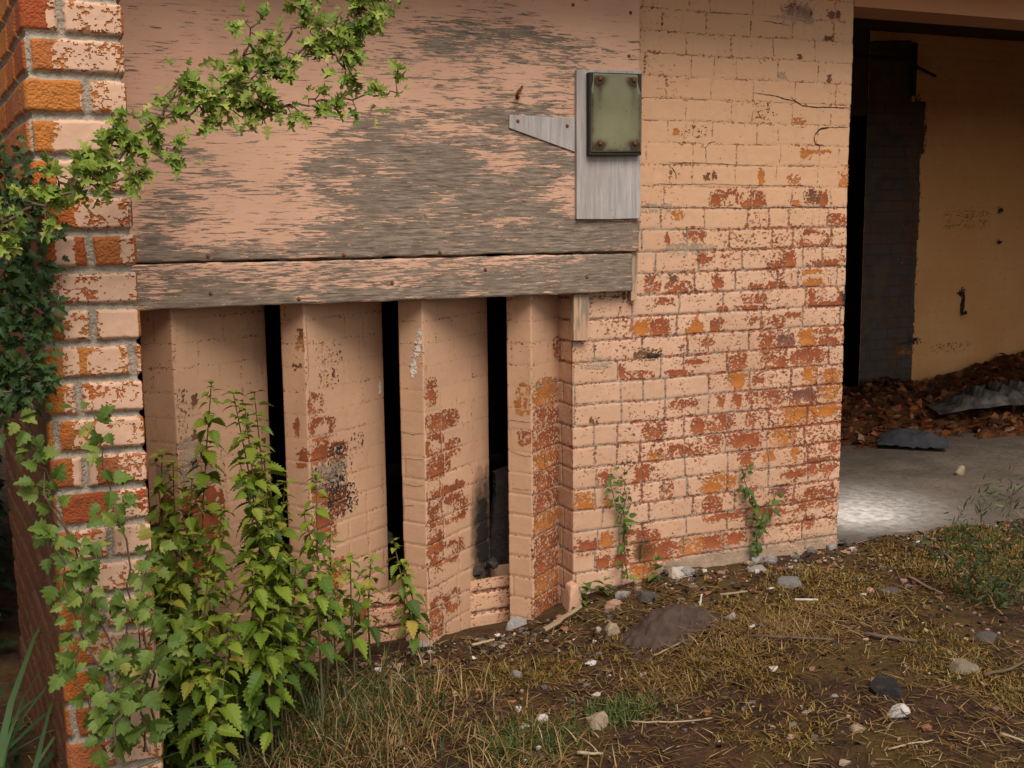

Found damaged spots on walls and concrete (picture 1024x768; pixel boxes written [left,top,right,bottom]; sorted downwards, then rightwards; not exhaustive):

crack [757,93,848,146]
peeling [45,0,229,664]
flaking render [292,328,364,546]
water stain [410,329,423,378]
flaking render [424,377,472,569]
flaking render [514,376,559,618]
flaking render [573,164,849,585]
flaking render [429,586,461,638]